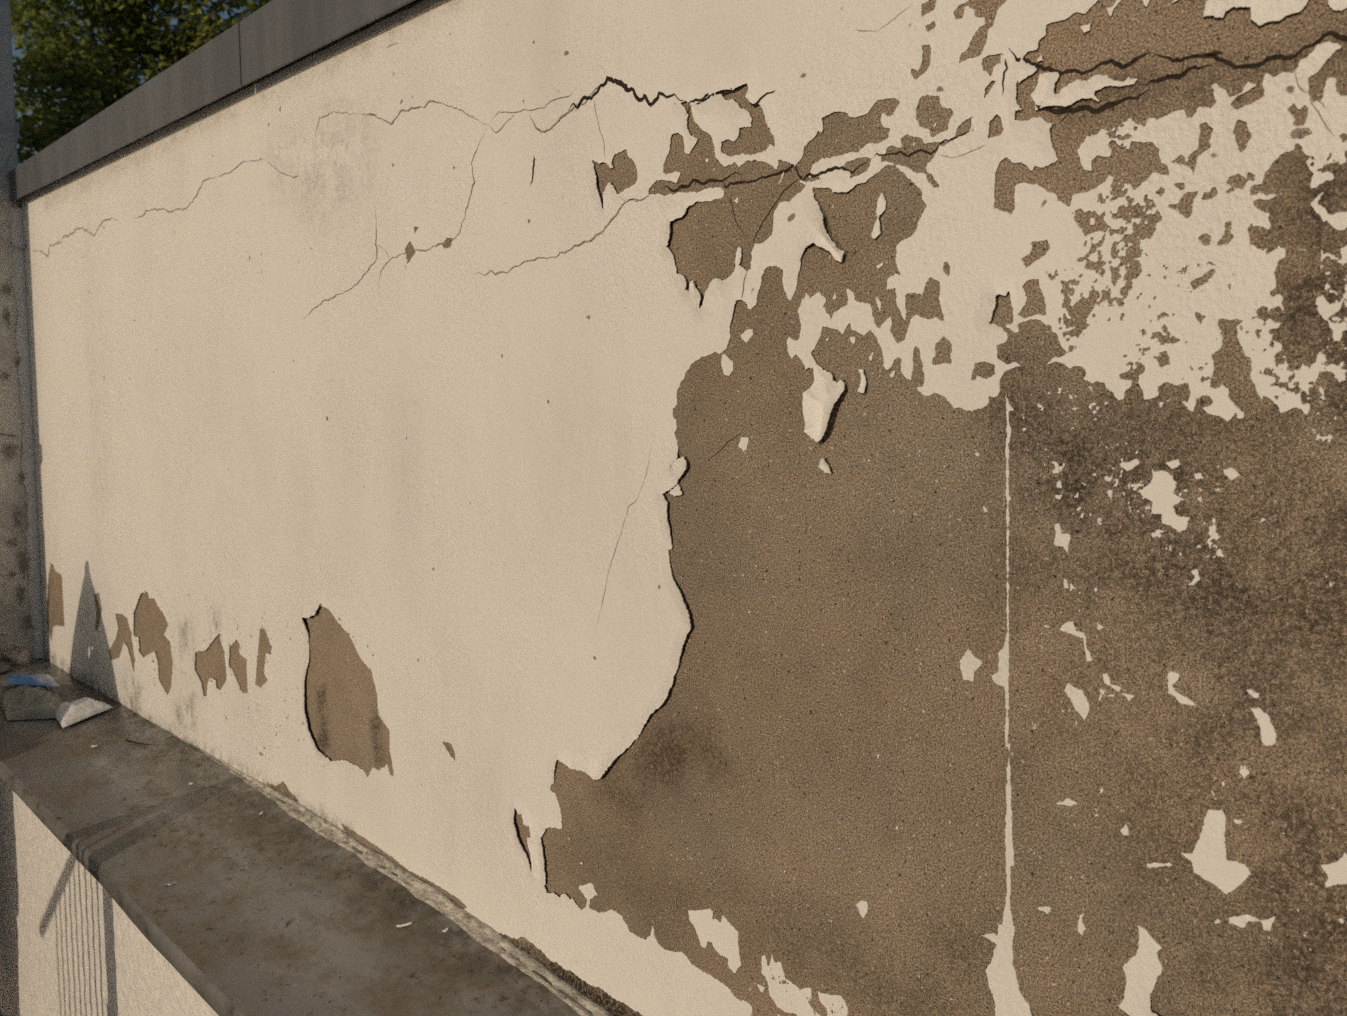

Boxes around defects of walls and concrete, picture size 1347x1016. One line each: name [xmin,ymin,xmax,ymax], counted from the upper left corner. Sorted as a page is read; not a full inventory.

crack [1002,31,1347,135]
crack [31,158,297,258]
crack [302,76,775,319]
crack [472,129,984,297]
peeling [500,0,1347,1016]
peeling [94,592,272,718]
peeling [275,606,394,776]